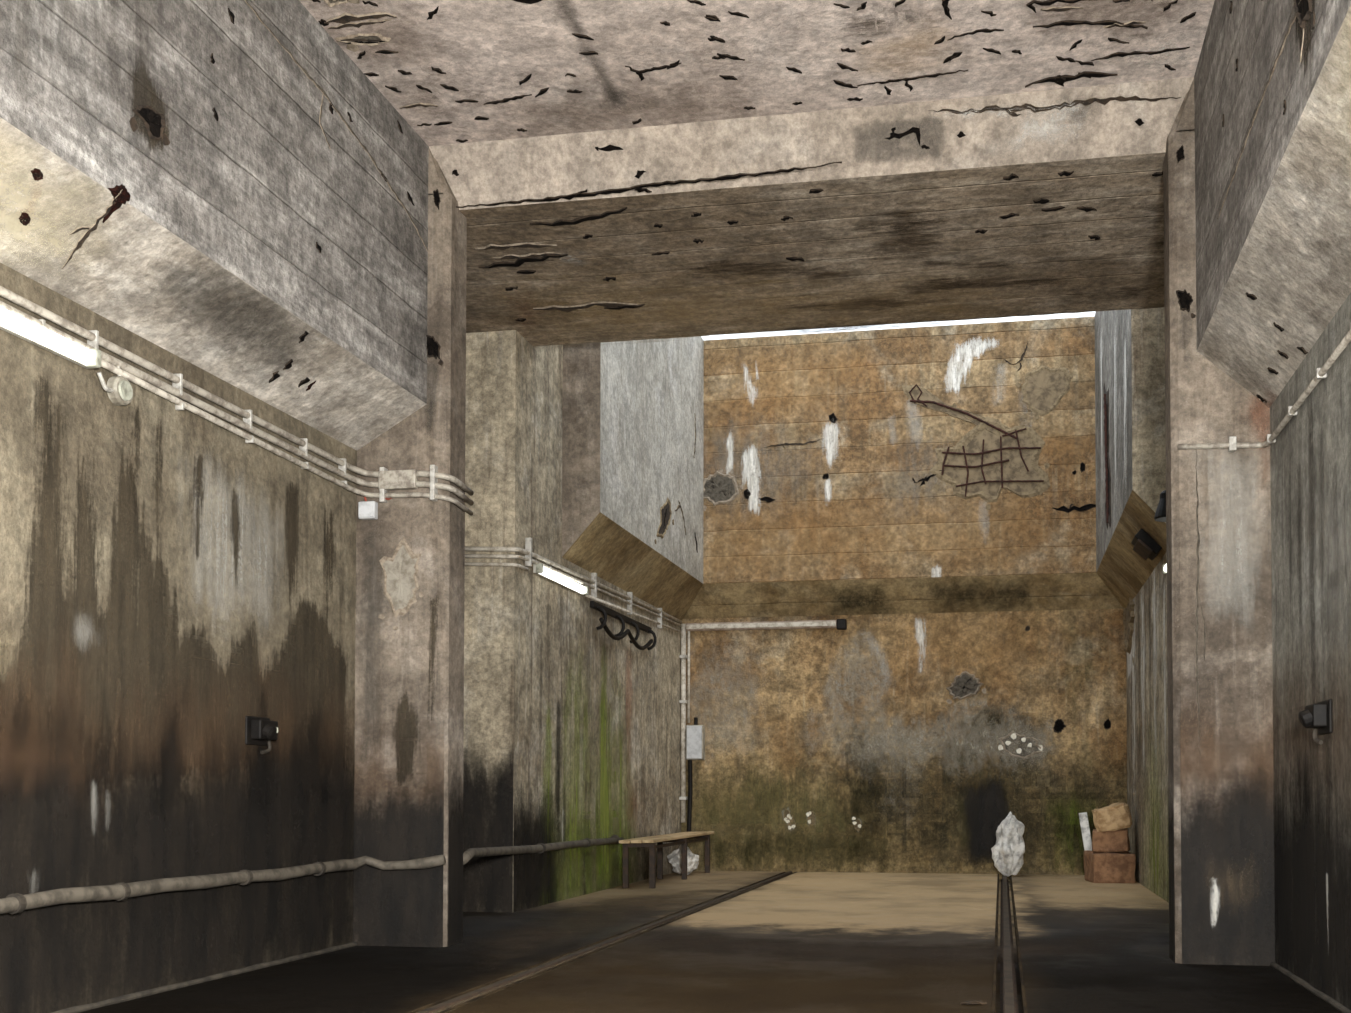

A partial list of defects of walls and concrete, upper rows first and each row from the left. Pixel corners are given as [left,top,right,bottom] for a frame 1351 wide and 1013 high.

spalling [1294,0,1315,68]
crack [61,189,124,269]
water stain [0,378,686,1013]
water stain [1167,766,1351,1010]